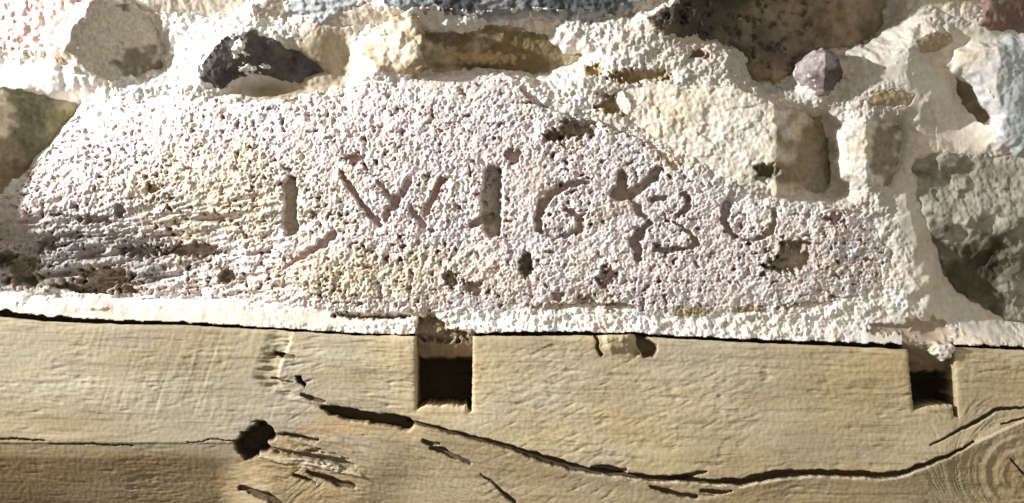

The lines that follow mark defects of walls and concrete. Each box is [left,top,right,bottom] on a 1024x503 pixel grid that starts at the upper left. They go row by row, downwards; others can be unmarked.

crack [0,309,1024,503]